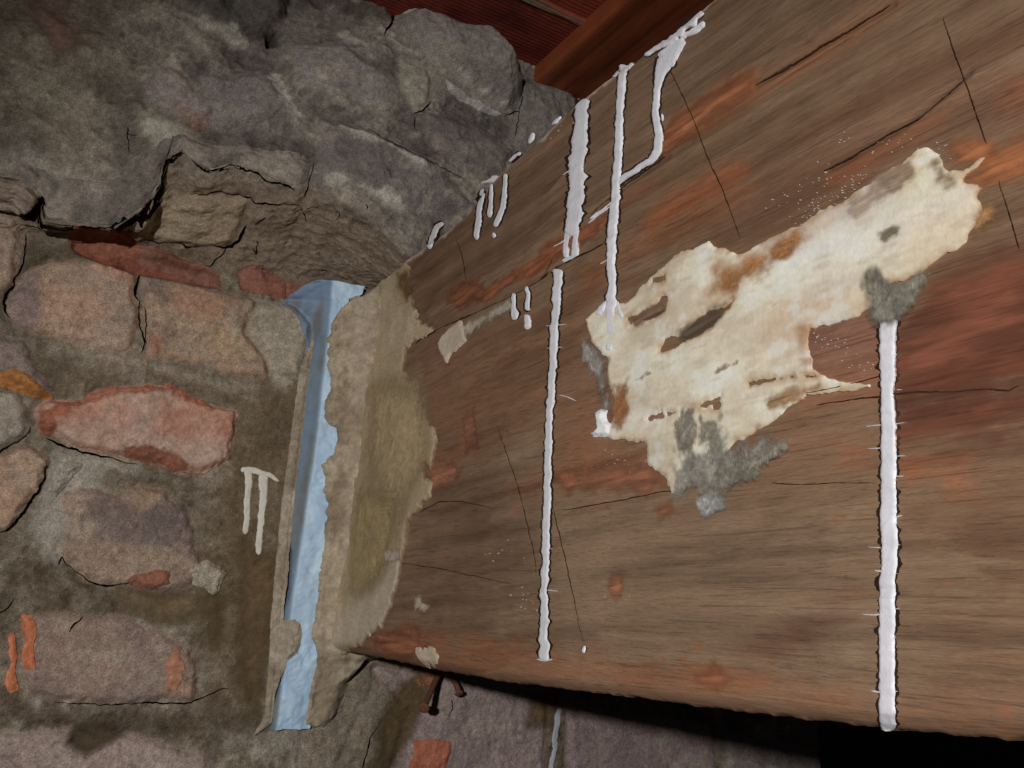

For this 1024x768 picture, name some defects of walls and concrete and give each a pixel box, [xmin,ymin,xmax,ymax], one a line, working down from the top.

crack [756,4,891,85]
crack [825,18,987,170]
crack [2,152,340,319]
rust [446,223,598,307]
damp [562,229,580,262]
damp [721,231,801,292]
damp [975,207,993,230]
crack [999,181,1019,247]
damp [613,385,629,428]
damp [241,467,279,482]
peeling [415,646,439,669]
crack [56,688,228,706]